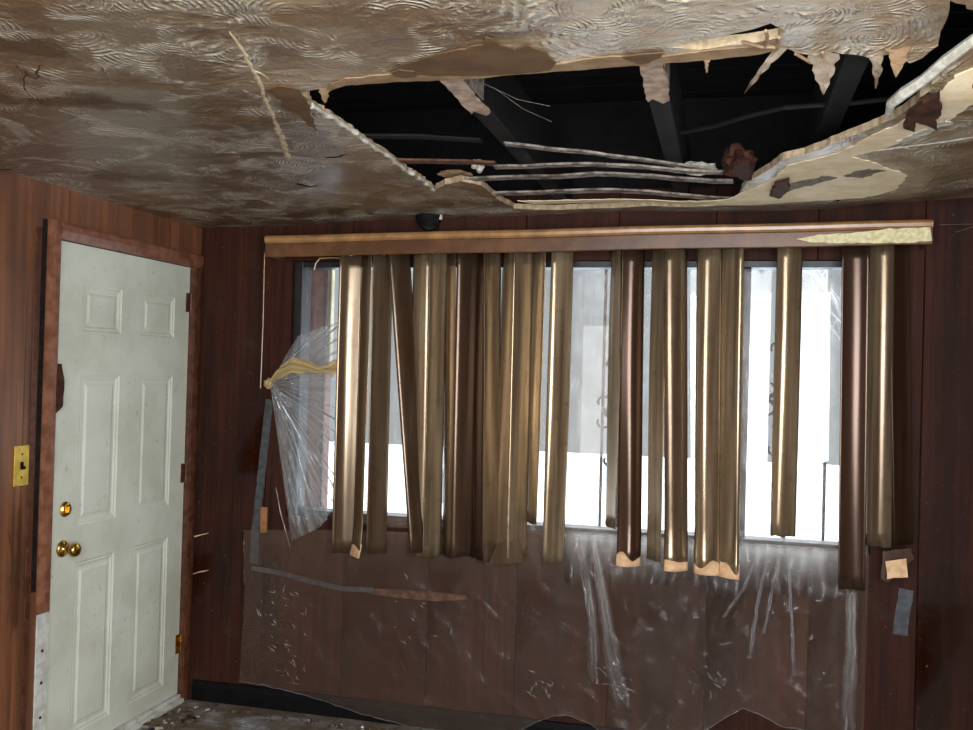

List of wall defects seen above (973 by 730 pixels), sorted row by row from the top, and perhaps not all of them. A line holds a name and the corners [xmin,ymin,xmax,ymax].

spalling [264,23,973,206]
spalling [837,1,973,134]